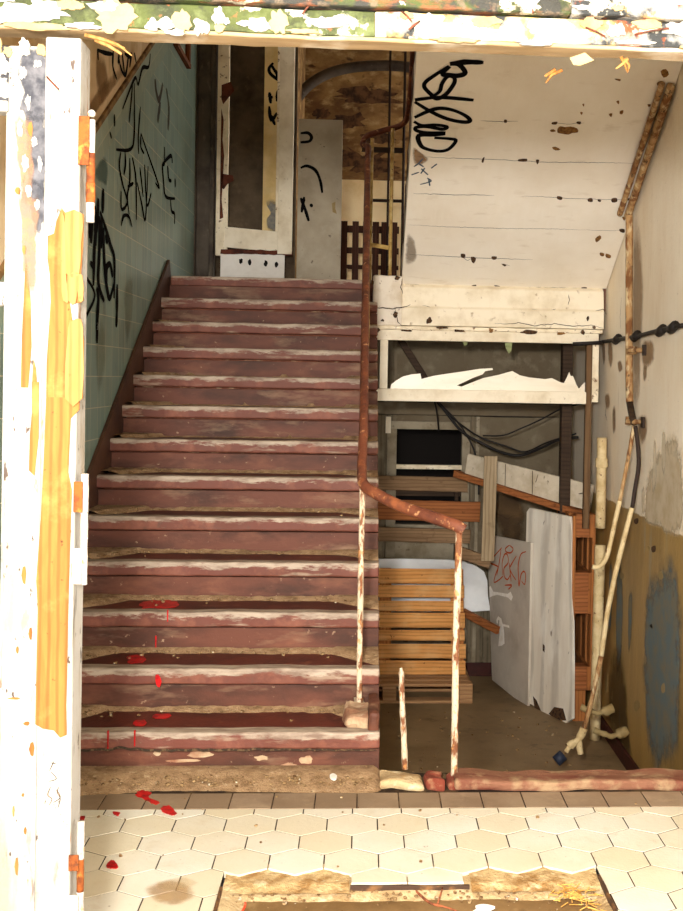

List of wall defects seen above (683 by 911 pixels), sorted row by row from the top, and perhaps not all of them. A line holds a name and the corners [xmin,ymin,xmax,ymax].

peeling [0,0,352,86]
peeling [400,0,683,49]
peeling [570,53,594,66]
peeling [21,209,84,738]
spalling [224,864,349,894]
spalling [469,863,601,892]